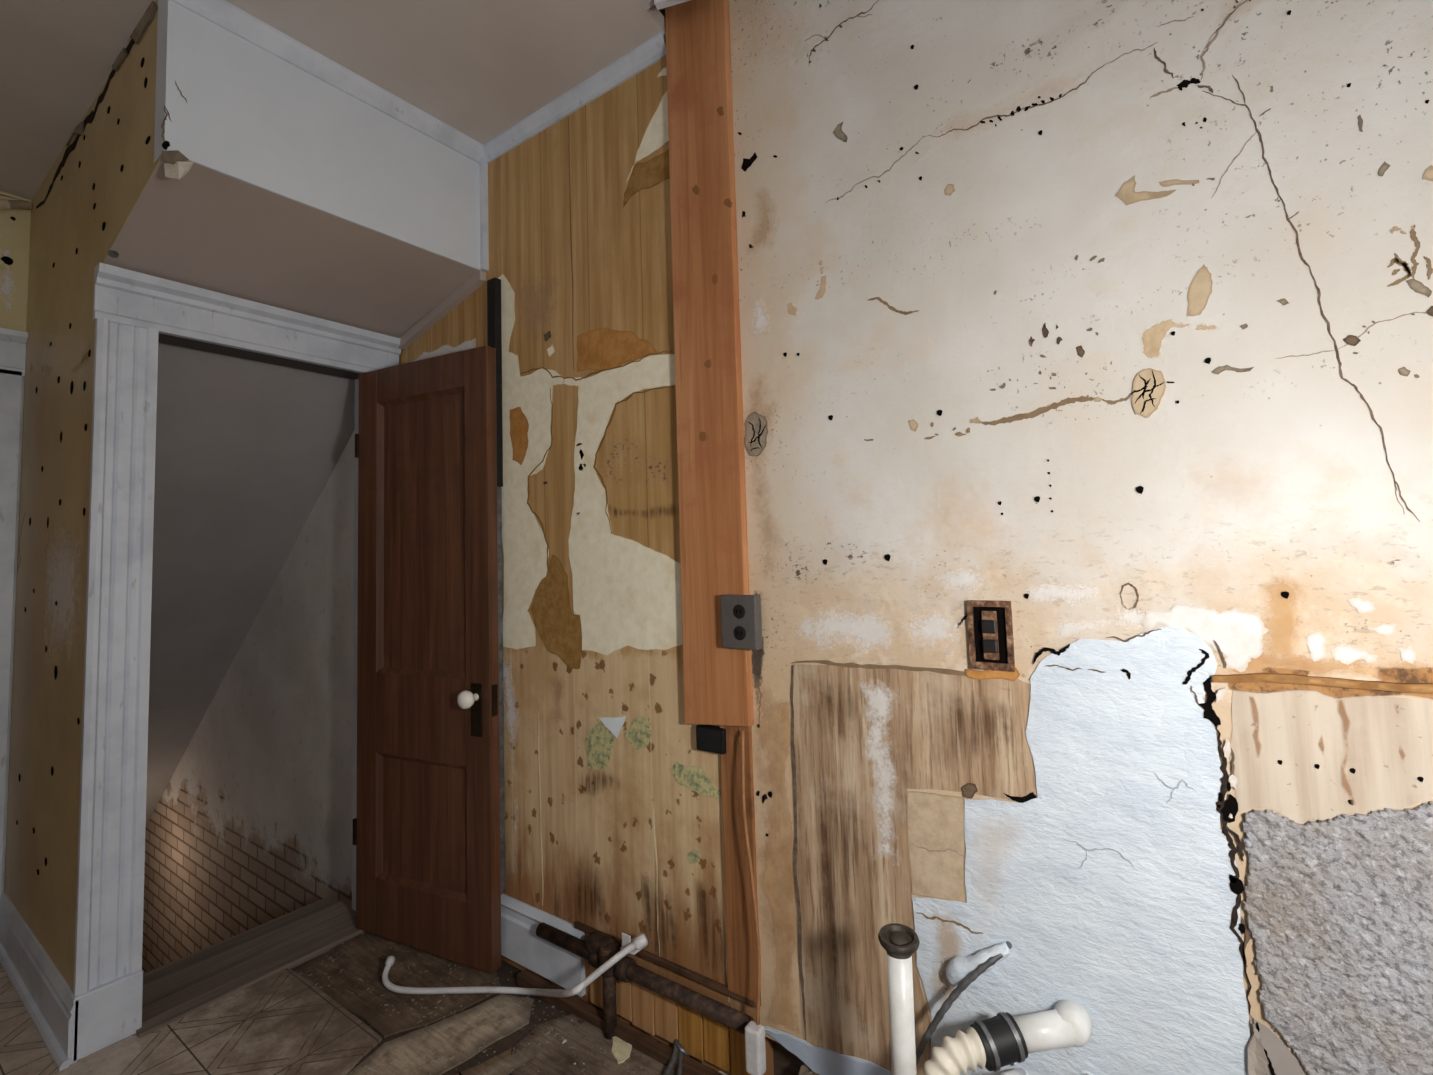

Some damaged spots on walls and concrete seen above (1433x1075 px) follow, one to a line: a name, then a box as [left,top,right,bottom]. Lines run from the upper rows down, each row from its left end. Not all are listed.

crack [0,1,158,209]
crack [825,42,1158,203]
peeling [1422,165,1433,181]
peeling [544,331,555,357]
peeling [908,265,1216,439]
crack [1203,75,1426,522]
leakage [1030,584,1097,603]
leakage [1058,609,1145,636]
leakage [503,665,517,760]
leakage [862,685,896,853]
leakage [821,823,849,950]
peeling [765,626,1433,1075]